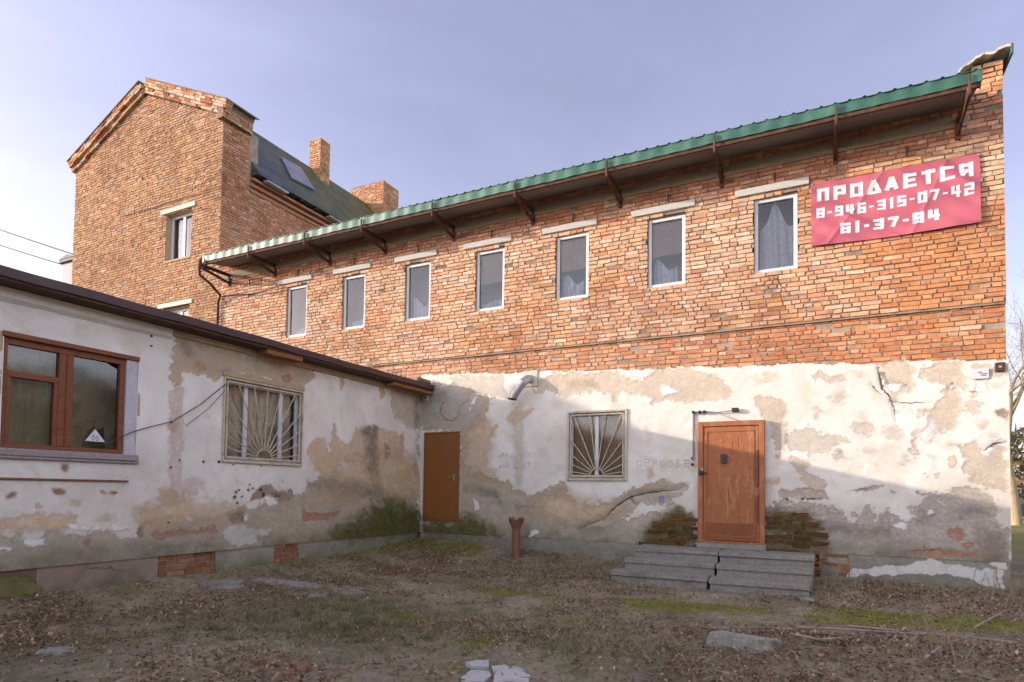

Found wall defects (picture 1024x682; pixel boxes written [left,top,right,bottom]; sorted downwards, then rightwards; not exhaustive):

flaking render [169,338,315,387]
crack [872,368,924,415]
flaking render [0,390,421,572]
crack [579,484,689,529]
flaking render [754,396,1011,589]